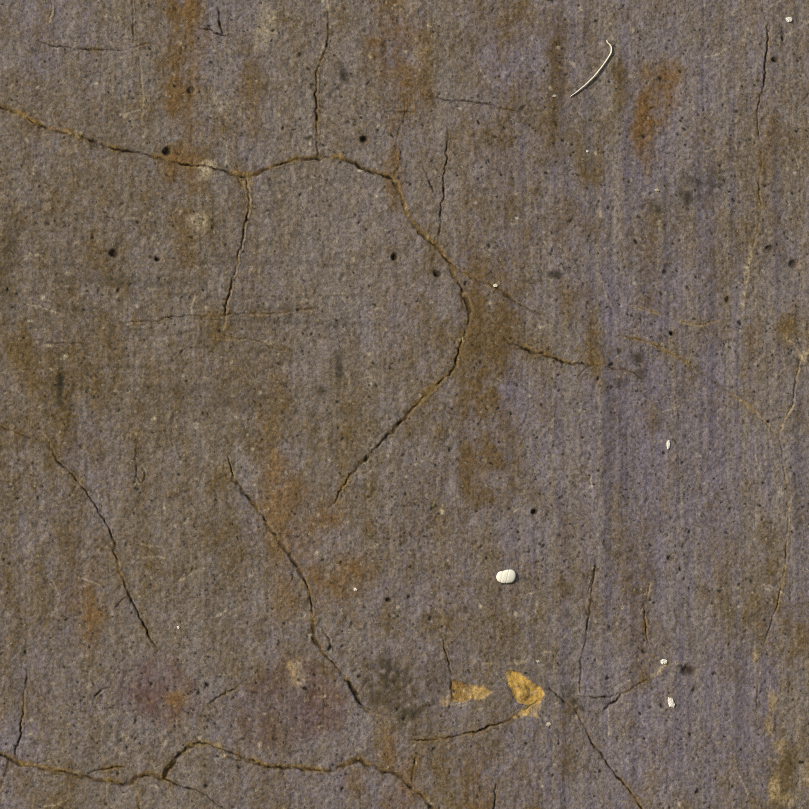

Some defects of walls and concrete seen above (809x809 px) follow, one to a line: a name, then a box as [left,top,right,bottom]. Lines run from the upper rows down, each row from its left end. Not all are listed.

corrosion [148,0,216,198]
corrosion [625,50,689,180]
crack [0,0,543,512]
crack [502,334,645,380]
crack [0,422,159,651]
crack [223,447,375,716]
crack [0,557,686,809]
spalling [438,680,494,708]
spalling [502,669,552,726]